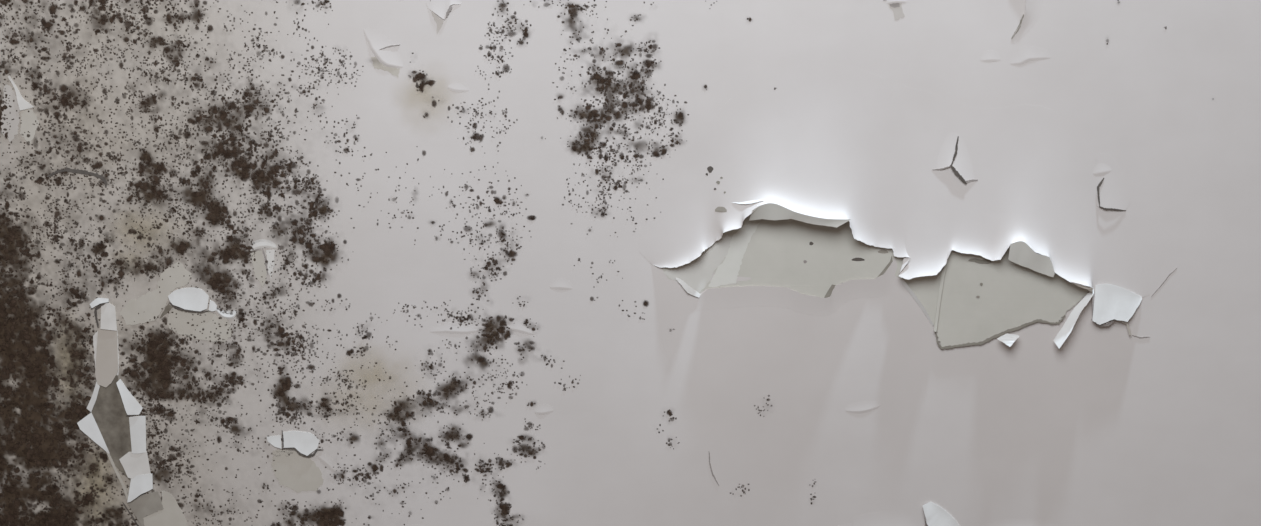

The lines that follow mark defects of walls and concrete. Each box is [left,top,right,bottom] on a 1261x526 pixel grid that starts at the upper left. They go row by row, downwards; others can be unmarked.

damp [0,0,581,526]
damp [530,0,689,233]
peeling [639,63,1177,349]
peeling [1011,0,1043,44]
peeling [77,262,236,526]
peeling [267,431,337,493]
peeling [923,502,959,526]